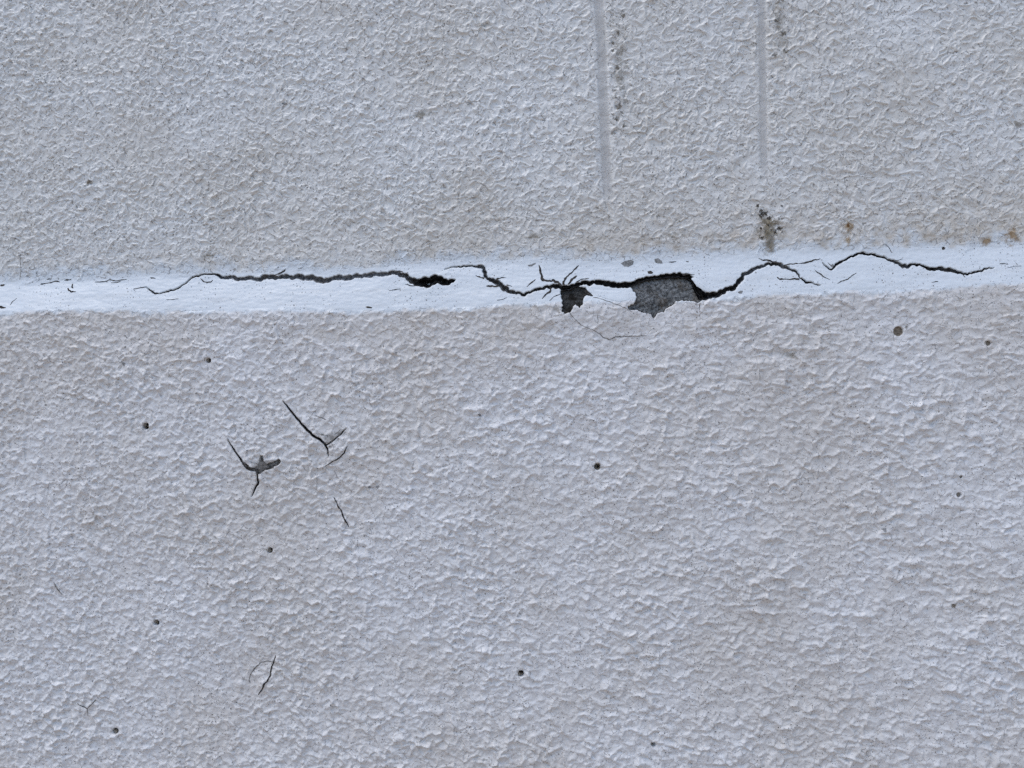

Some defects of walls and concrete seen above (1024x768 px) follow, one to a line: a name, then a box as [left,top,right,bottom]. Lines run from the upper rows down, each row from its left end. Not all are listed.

crack [135,244,1014,340]
spalling [560,258,711,318]
crack [228,441,281,496]
crack [283,401,349,527]